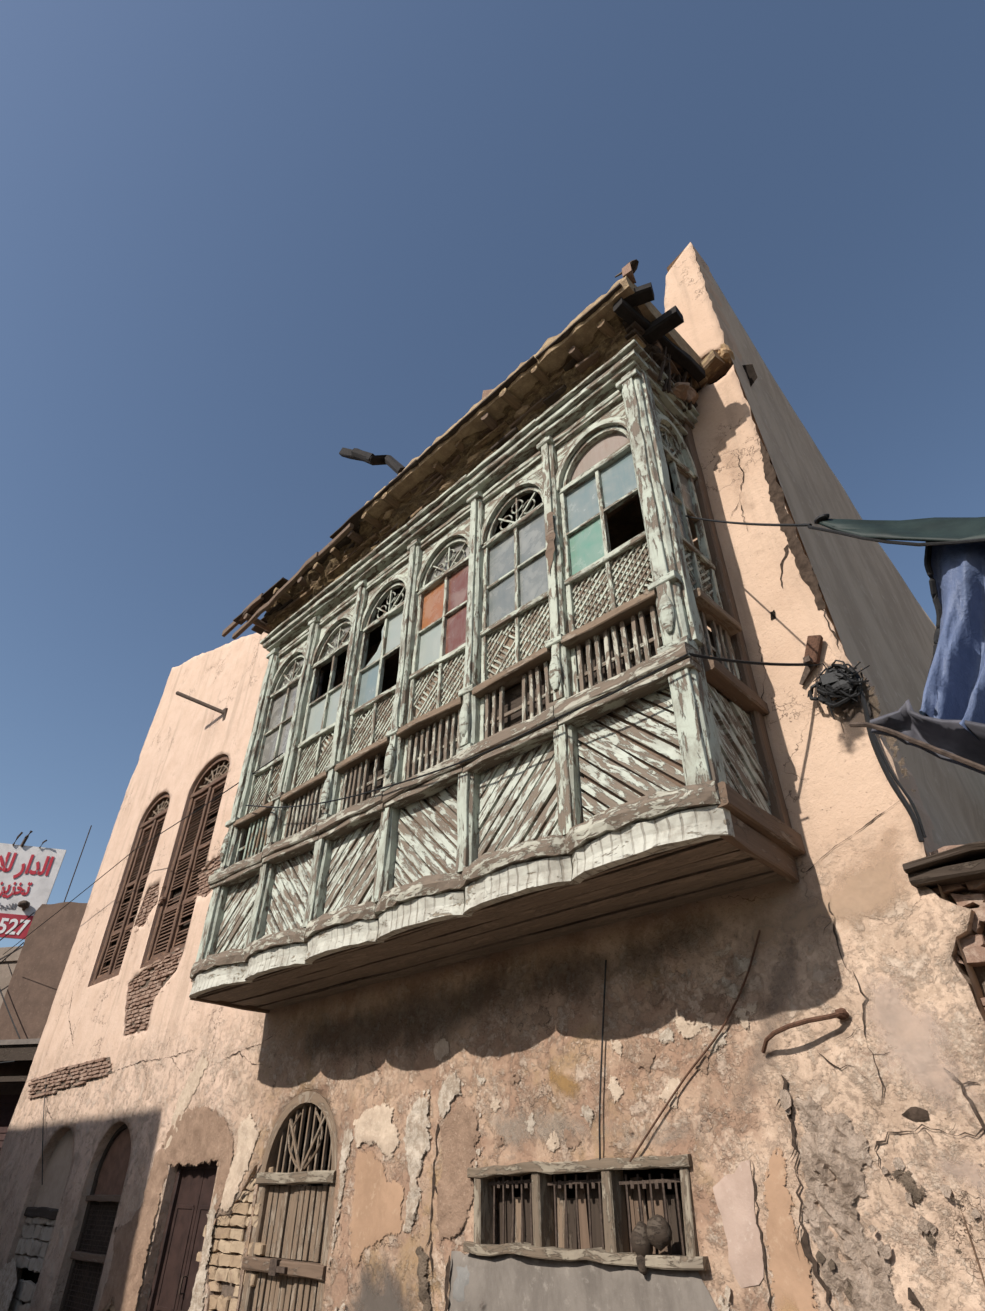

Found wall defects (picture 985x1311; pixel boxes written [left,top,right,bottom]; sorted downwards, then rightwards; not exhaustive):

crack [730,441,839,649]
crack [806,800,985,1192]
peeling [0,1258,17,1311]
flaking render [98,1105,276,1311]
flaking render [327,1038,520,1268]
flaking render [415,1246,433,1311]
crack [752,1075,834,1311]
crack [908,1287,922,1311]